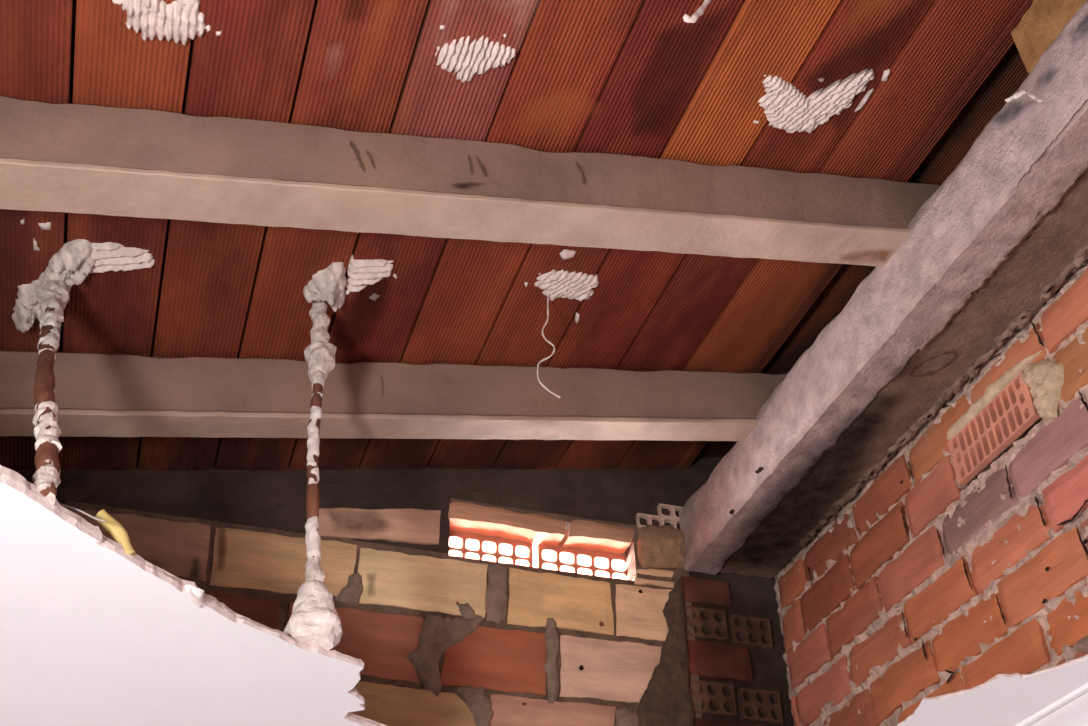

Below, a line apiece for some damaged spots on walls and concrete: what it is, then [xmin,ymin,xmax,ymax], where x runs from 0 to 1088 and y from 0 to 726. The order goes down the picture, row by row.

peeling [185,585,204,608]
spalling [456,602,484,621]